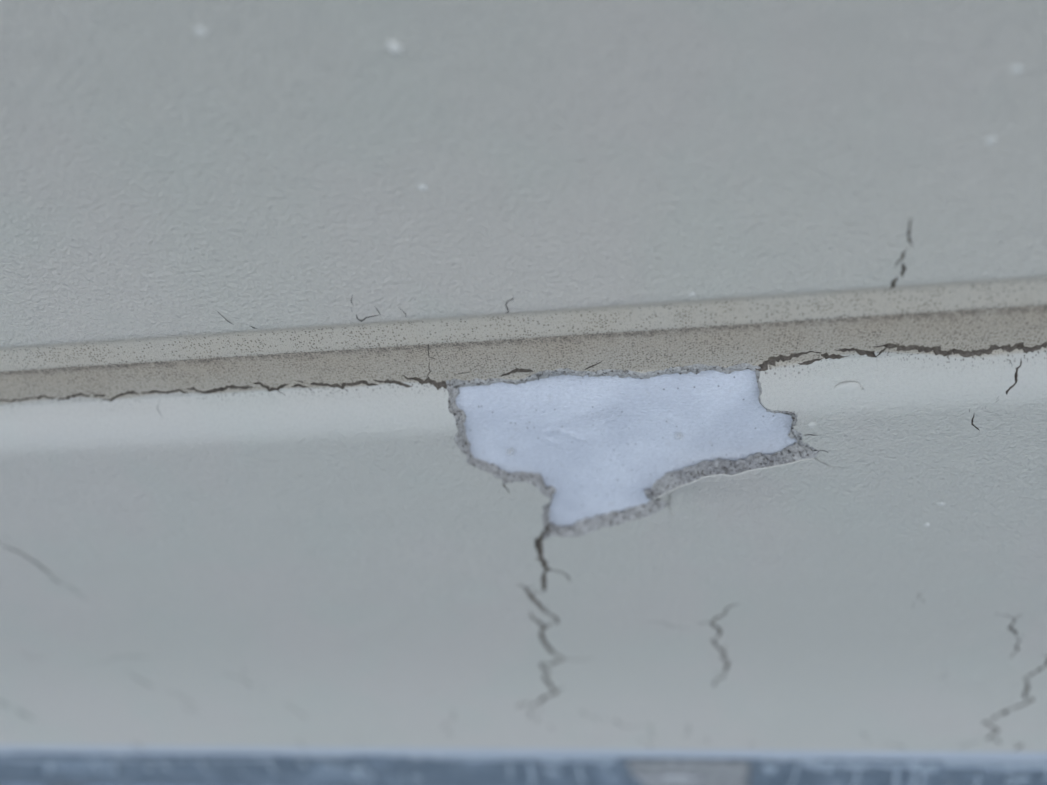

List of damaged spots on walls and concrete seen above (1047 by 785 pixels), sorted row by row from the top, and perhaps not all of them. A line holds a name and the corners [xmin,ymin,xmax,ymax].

crack [889,219,913,289]
crack [0,345,469,416]
crack [500,355,534,377]
crack [755,342,1047,431]
flaking render [446,363,838,550]
crack [516,525,594,729]
crack [697,604,739,686]
crack [982,613,1047,750]